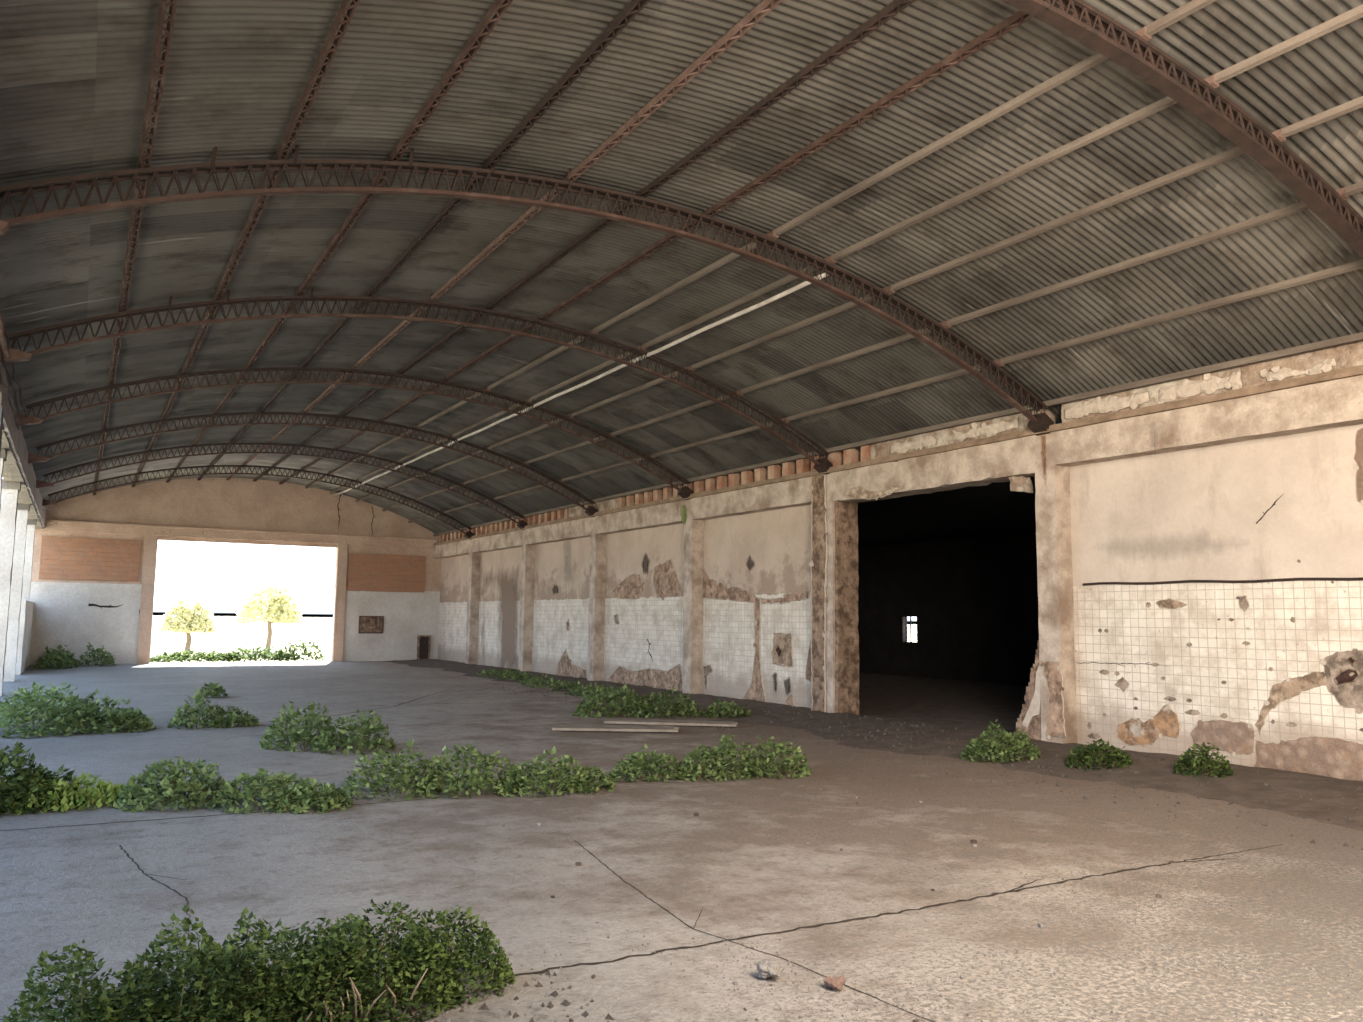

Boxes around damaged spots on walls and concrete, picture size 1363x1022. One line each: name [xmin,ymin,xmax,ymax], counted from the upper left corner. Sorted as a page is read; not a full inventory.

flaking render [844,485,904,500]
flaking render [1353,428,1363,505]
flaking render [613,559,683,625]
flaking render [702,474,828,712]
peeling [556,649,587,678]
peeling [608,664,683,691]
flaking render [1040,661,1066,740]
peeling [1087,648,1363,781]
crack [3,810,279,918]
crack [514,841,1282,1022]